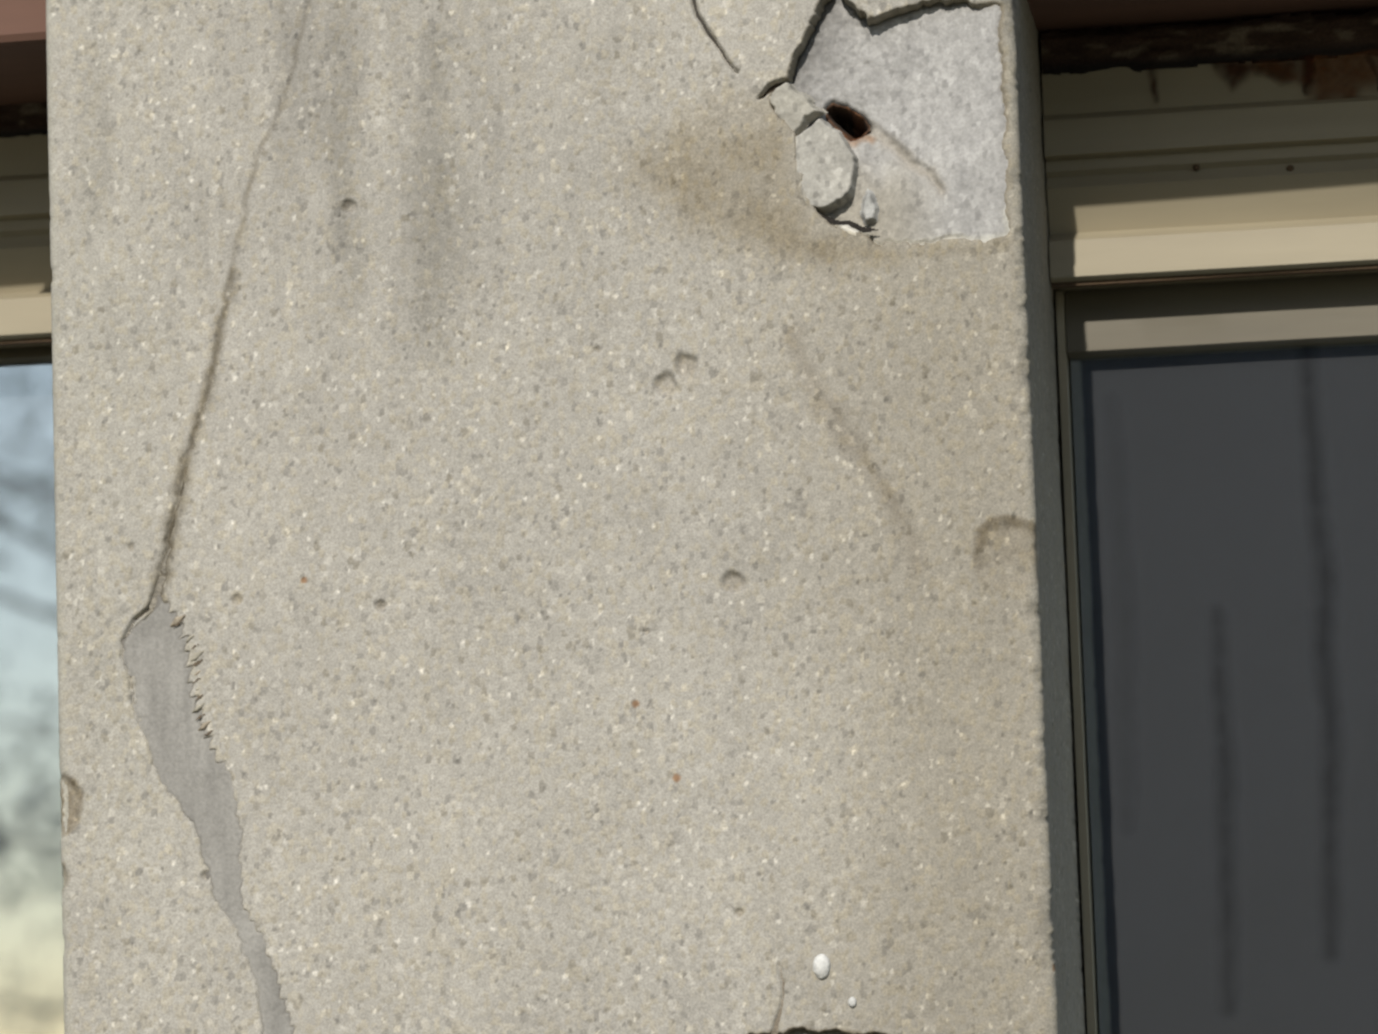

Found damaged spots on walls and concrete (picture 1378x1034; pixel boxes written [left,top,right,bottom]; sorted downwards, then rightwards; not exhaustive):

crack [692,0,737,73]
spalling [762,0,1010,246]
corrosion [1214,50,1378,100]
crack [122,471,295,1034]